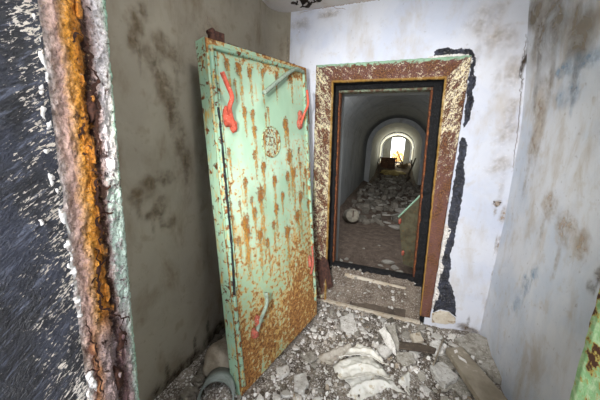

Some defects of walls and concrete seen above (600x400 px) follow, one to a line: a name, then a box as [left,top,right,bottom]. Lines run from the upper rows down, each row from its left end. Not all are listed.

spalling [291,0,322,8]
damp [528,0,564,45]
damp [570,4,596,58]
corrosion [71,64,85,87]
corrosion [79,121,115,221]
corrosion [317,256,333,291]
corrosion [97,283,121,312]